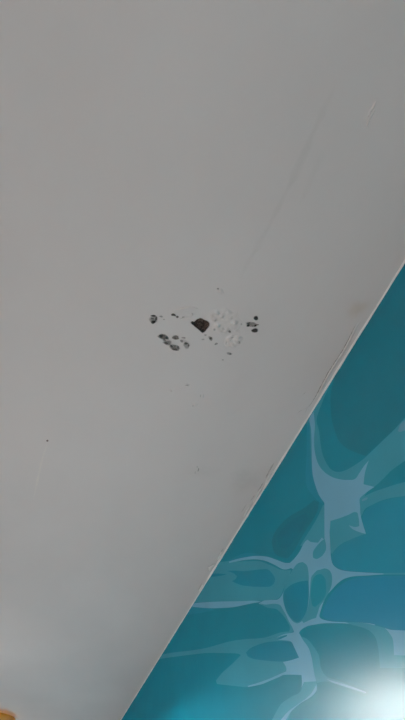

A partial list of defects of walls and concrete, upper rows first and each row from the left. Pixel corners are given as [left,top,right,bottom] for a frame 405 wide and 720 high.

spalling [191,318,209,333]
water stain [158,334,189,351]